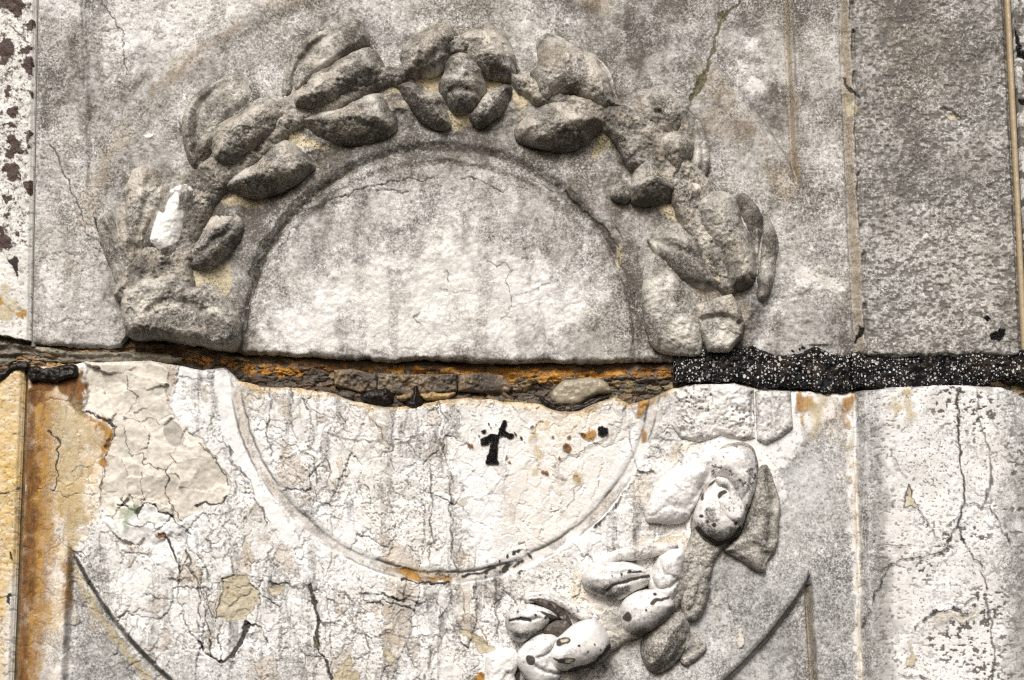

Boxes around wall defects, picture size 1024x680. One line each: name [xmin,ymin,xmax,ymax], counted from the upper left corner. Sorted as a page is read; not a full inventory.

crack [688,0,741,112]
rust [18,371,112,680]
spalling [81,361,232,522]
spalling [146,533,290,663]
crack [0,388,468,680]
crack [493,578,501,641]
rust [385,364,672,385]
crack [557,423,656,528]
rust [636,400,653,417]
crack [861,387,1010,680]